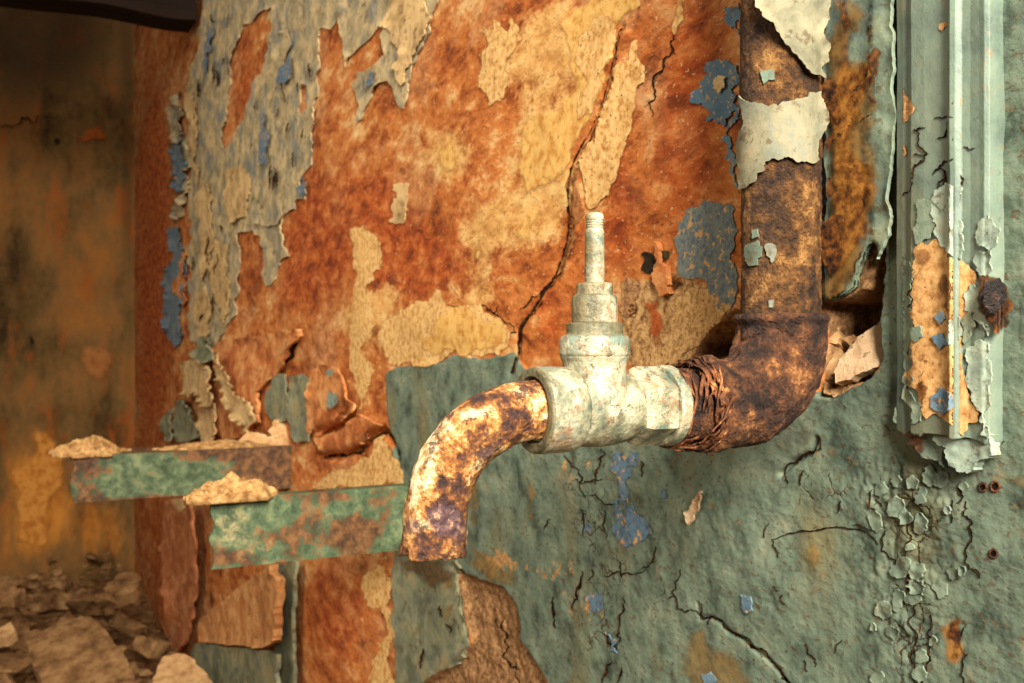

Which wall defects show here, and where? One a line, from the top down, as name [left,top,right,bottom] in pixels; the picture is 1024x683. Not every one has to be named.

peeling [159,0,511,489]
crack [450,28,624,373]
corrosion [646,302,663,338]
peeling [618,200,738,366]
peeling [689,0,915,302]
spalling [824,331,864,398]
corrosion [820,0,882,299]
peeling [893,182,1001,474]
crack [551,546,656,683]
crack [763,489,933,683]
corrosion [944,619,962,662]
crack [950,487,980,578]